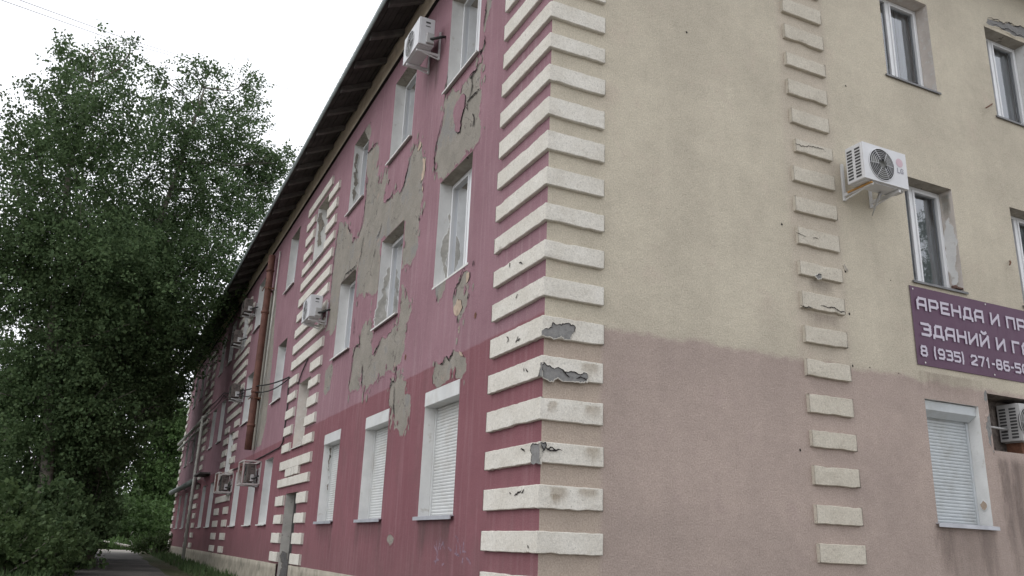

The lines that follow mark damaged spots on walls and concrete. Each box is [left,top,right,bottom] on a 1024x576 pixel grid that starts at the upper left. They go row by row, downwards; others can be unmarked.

peeling [325,0,493,438]
spalling [541,322,576,341]
spalling [523,362,589,383]
spalling [521,441,562,465]